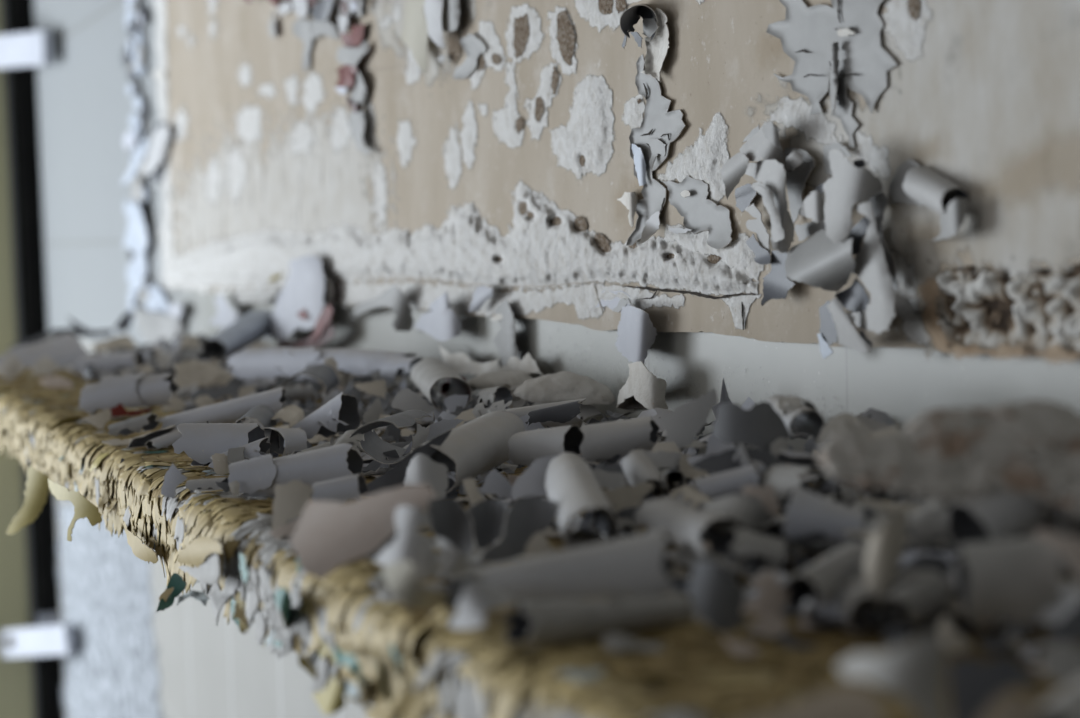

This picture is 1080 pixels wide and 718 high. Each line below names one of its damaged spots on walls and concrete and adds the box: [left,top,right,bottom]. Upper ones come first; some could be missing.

peeling [7,0,189,352]
peeling [204,0,388,232]
peeling [396,120,416,168]
peeling [380,0,461,84]
spalling [190,255,685,424]
peeling [442,0,1080,363]
damp [747,0,1080,331]
peeling [0,367,1080,718]